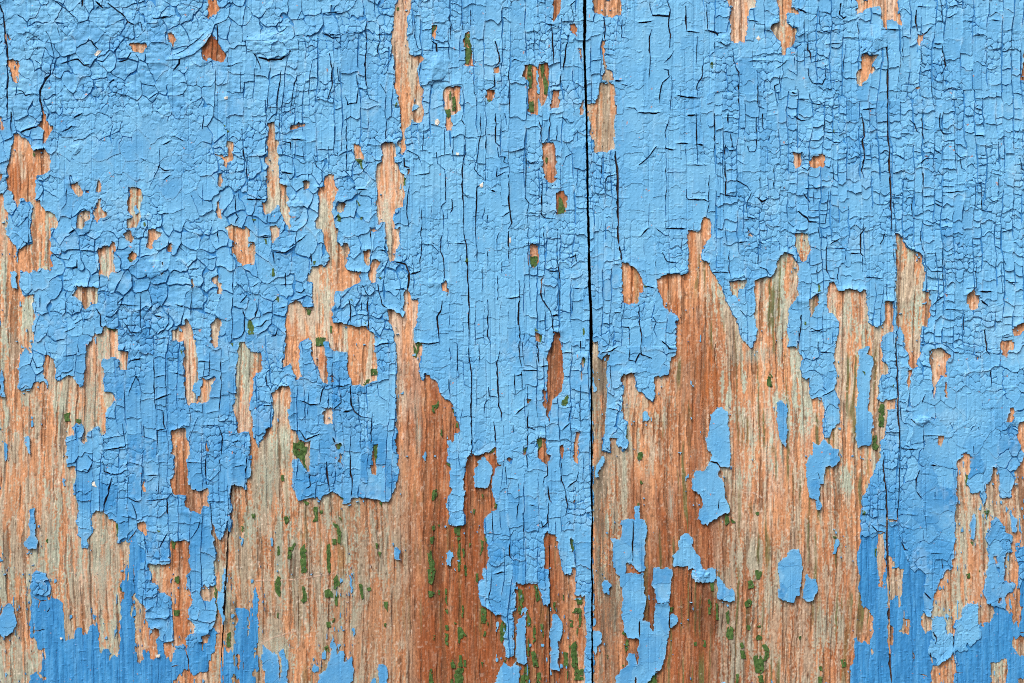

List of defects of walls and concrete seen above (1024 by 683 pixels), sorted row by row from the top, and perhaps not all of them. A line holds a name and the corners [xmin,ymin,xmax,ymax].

crack [0,5,131,133]
crack [254,2,392,190]
peeling [579,38,617,153]
peeling [727,0,756,43]
peeling [771,0,800,55]
crack [86,359,247,671]
crack [232,235,312,336]
crack [300,384,397,495]
peeling [276,0,424,386]
peeling [0,111,951,683]
crack [349,0,1016,683]
peeling [875,407,1024,683]